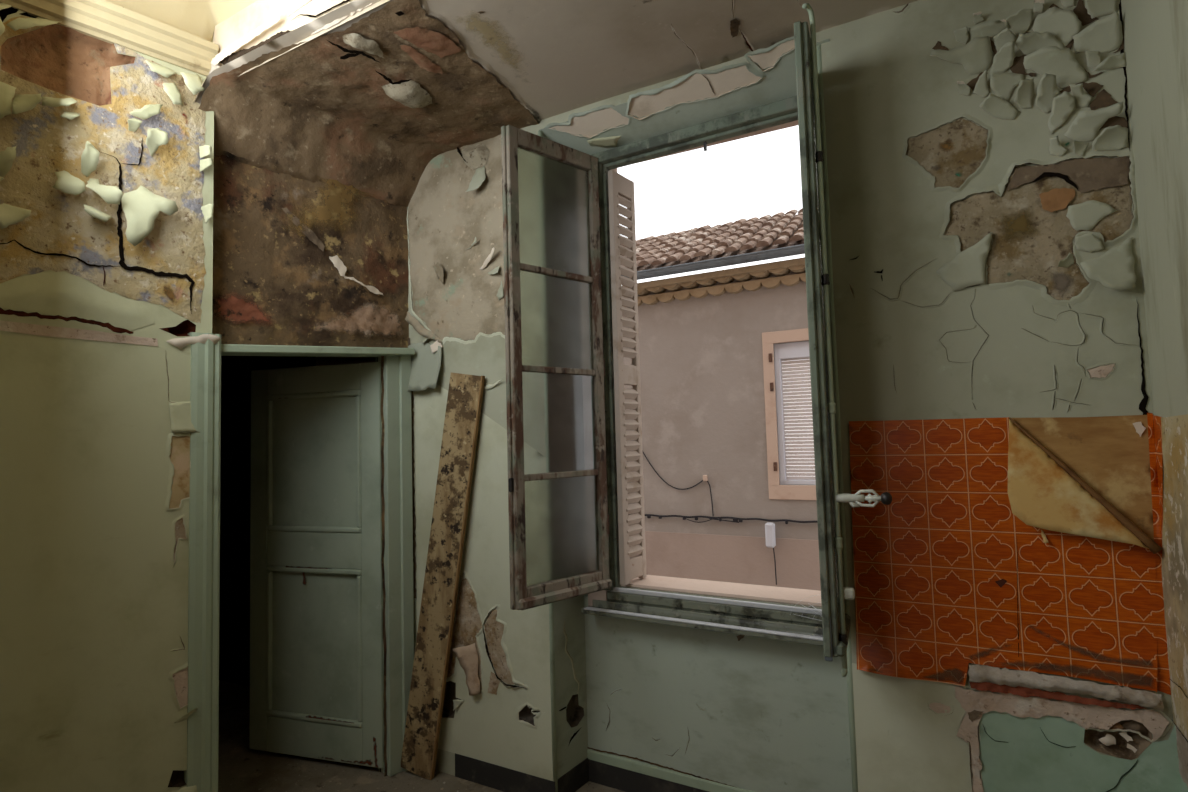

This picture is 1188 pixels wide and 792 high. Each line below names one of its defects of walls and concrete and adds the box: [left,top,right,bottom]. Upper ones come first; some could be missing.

crack [288,0,350,20]
crack [0,308,134,334]
crack [0,138,195,314]
peeling [0,0,795,598]
crack [848,255,991,410]
peeling [902,0,1138,306]
crack [1021,300,1149,437]
peeling [446,570,542,729]
spalling [953,685,1188,792]